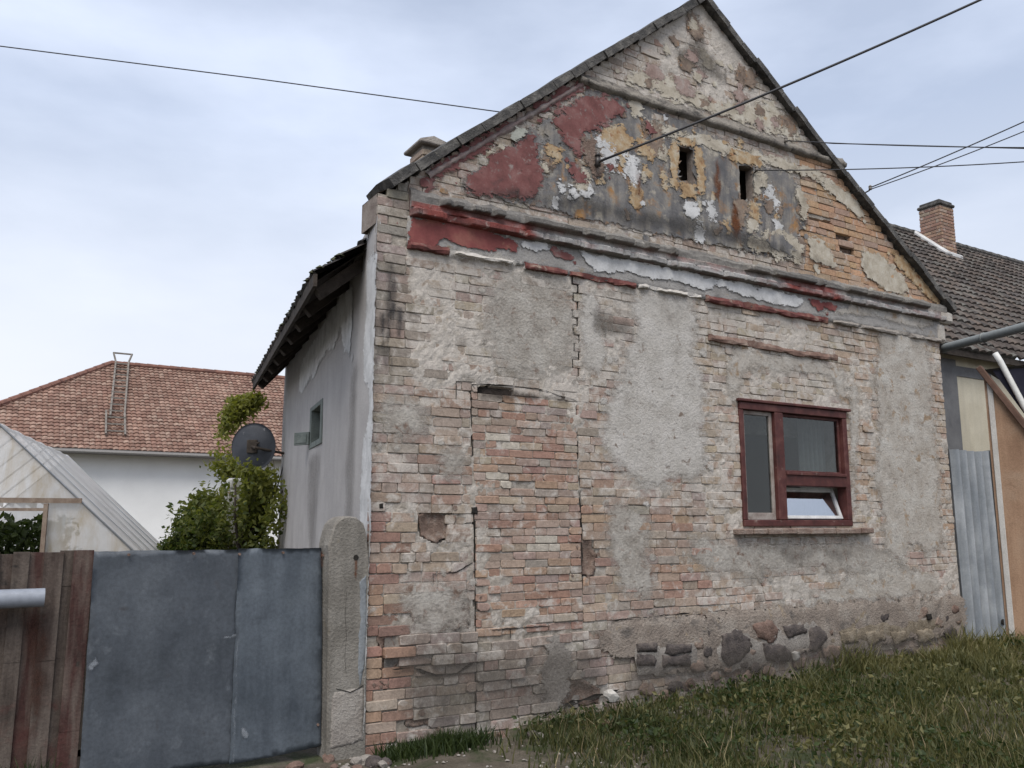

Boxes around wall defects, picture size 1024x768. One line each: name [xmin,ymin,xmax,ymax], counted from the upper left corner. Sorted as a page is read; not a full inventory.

peeling [420,12,940,304]
peeling [397,217,837,316]
hole [476,386,510,396]
peeling [296,232,425,749]
spalling [417,502,458,543]
spalling [571,540,600,578]
spalling [560,679,600,713]